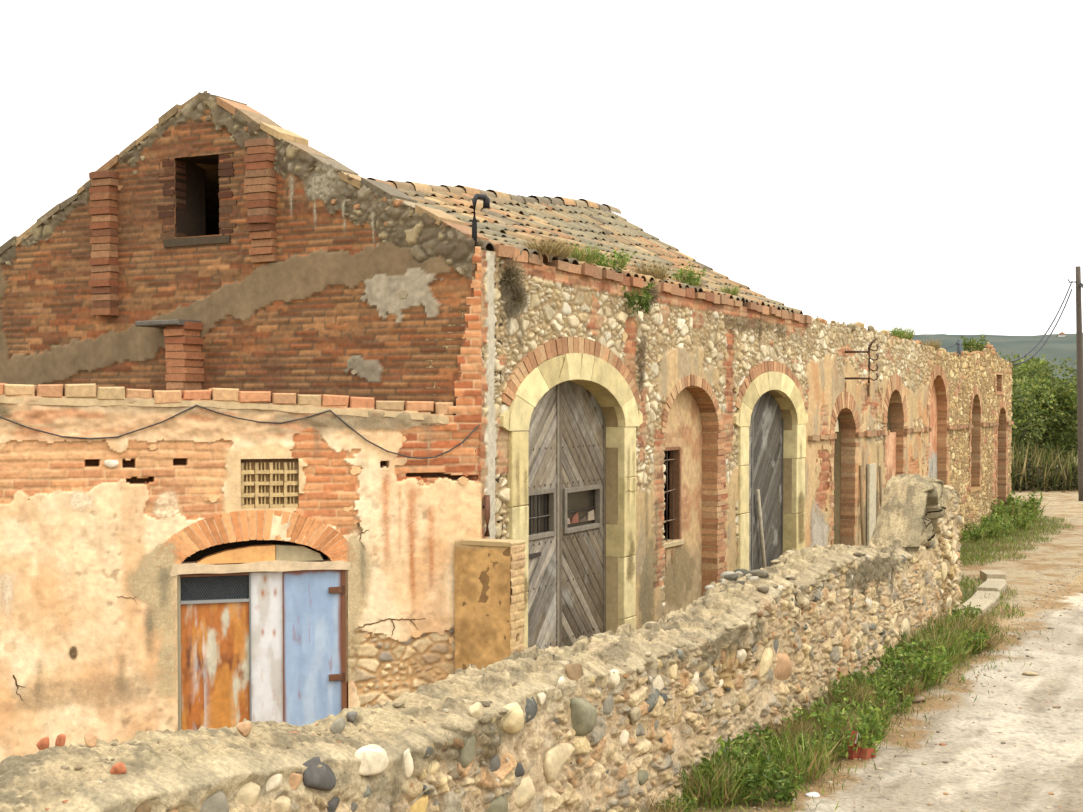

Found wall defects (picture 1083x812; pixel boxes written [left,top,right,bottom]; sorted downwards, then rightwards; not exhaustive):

peeling [360,267,444,322]
peeling [0,438,234,519]
peeling [290,427,364,535]